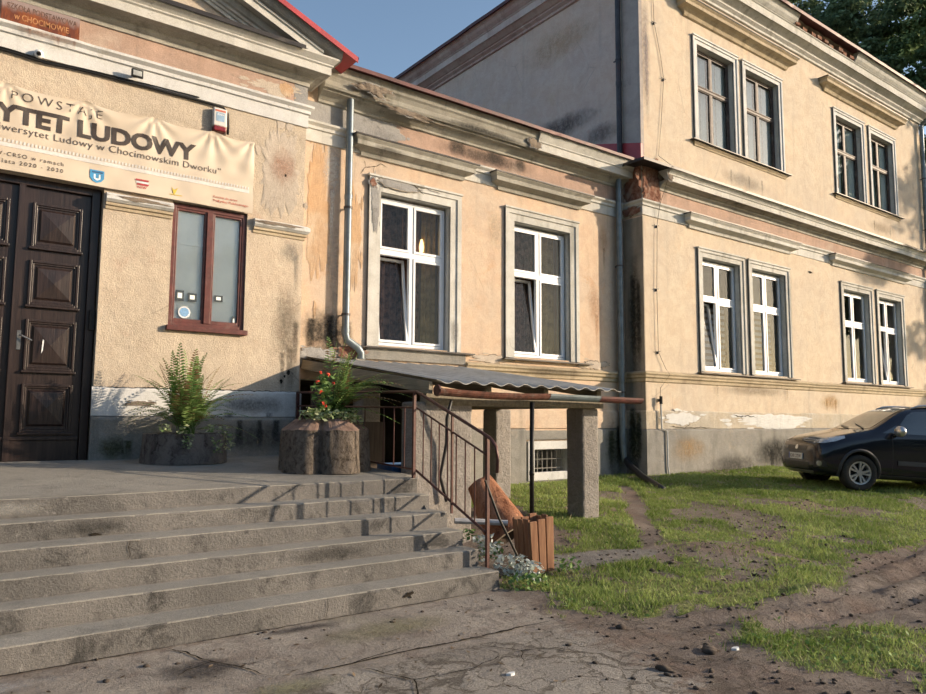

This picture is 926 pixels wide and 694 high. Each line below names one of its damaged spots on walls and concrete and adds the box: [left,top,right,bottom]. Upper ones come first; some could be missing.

flaking render [622,158,674,218]
leakage [307,295,350,348]
leakage [630,278,640,350]
peeling [659,408,706,427]
peeling [720,414,812,429]
crack [0,591,485,677]
crack [299,621,578,694]